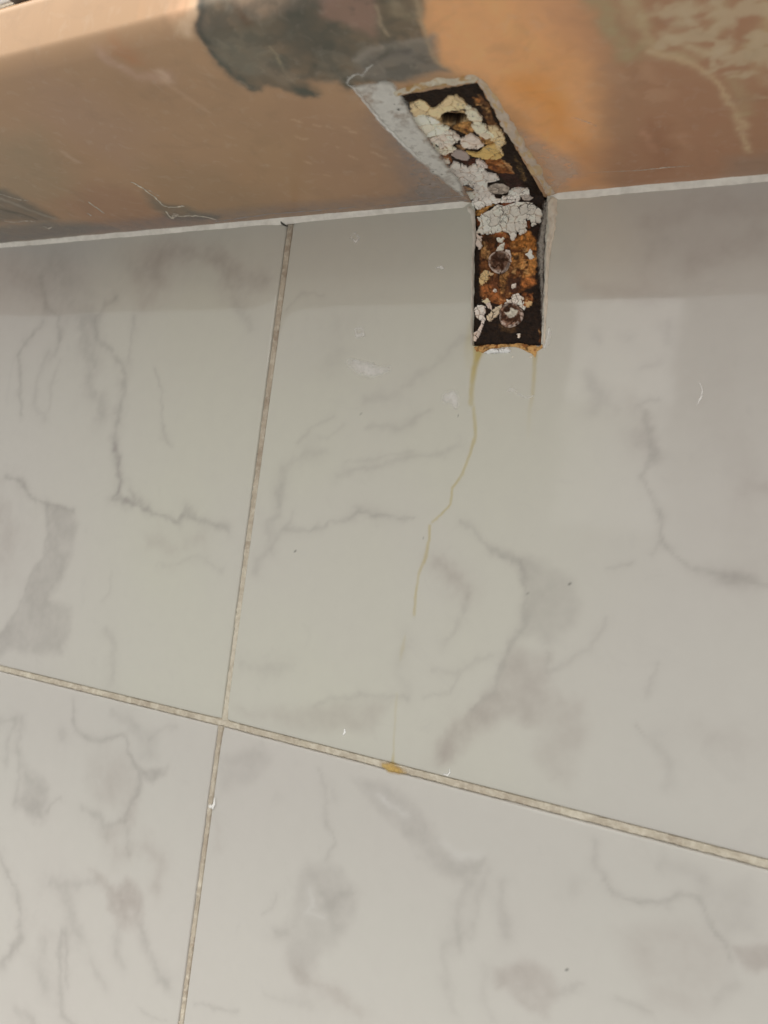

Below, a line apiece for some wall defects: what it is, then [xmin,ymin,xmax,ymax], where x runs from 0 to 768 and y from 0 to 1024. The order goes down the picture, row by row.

peeling [394,94,543,262]
peeling [474,270,533,342]
corrosion [474,343,543,357]
corrosion [382,764,402,773]